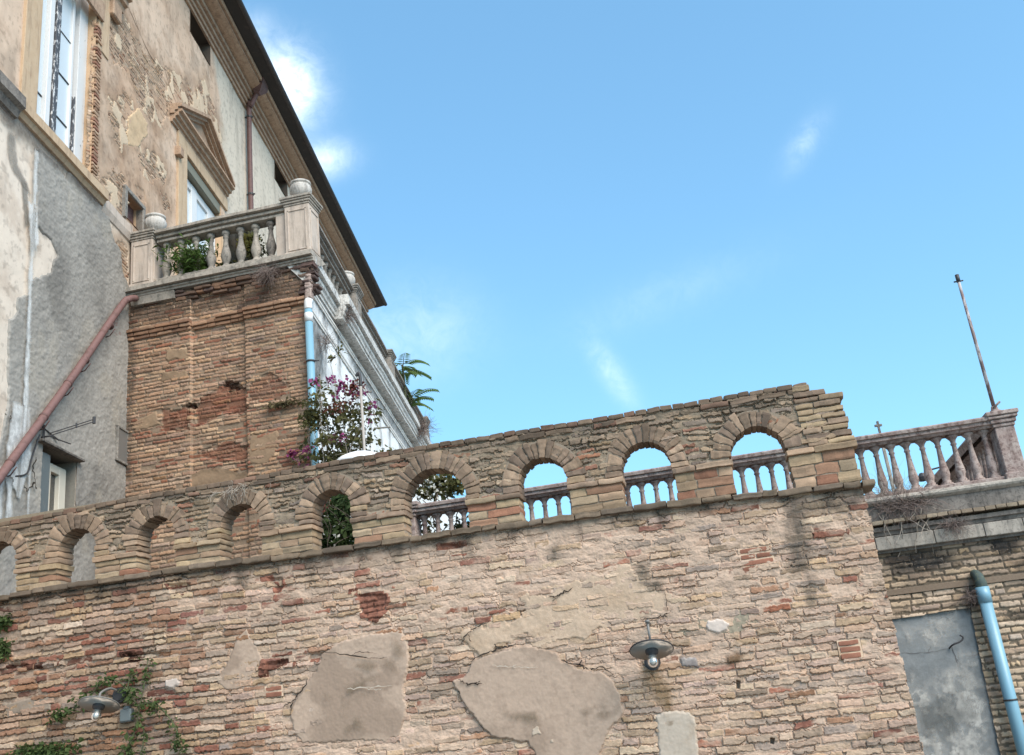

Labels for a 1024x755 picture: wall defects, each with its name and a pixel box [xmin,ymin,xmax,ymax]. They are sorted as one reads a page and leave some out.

peeling [85,16,222,216]
crack [325,651,384,659]
crack [458,621,535,686]